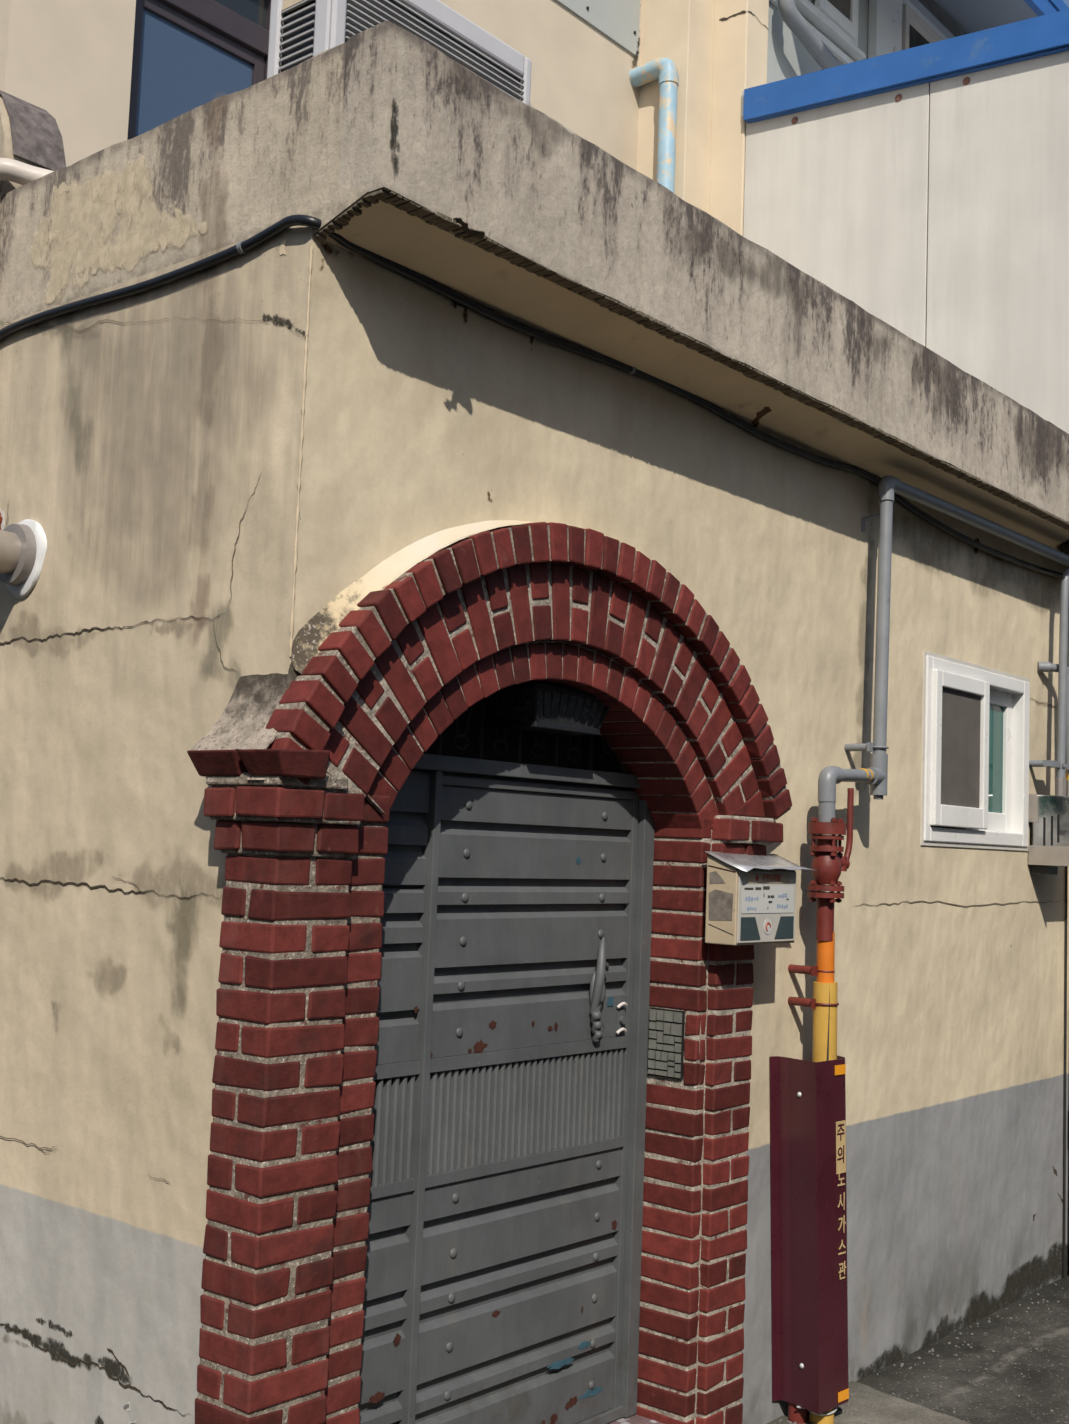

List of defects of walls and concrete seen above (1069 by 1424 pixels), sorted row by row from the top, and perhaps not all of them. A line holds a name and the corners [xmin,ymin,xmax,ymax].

peeling [31,156,207,303]
crack [0,476,260,672]
spalling [1057,540,1069,555]
crack [0,876,221,995]
crack [0,1318,186,1416]
leakage [858,1244,1069,1380]